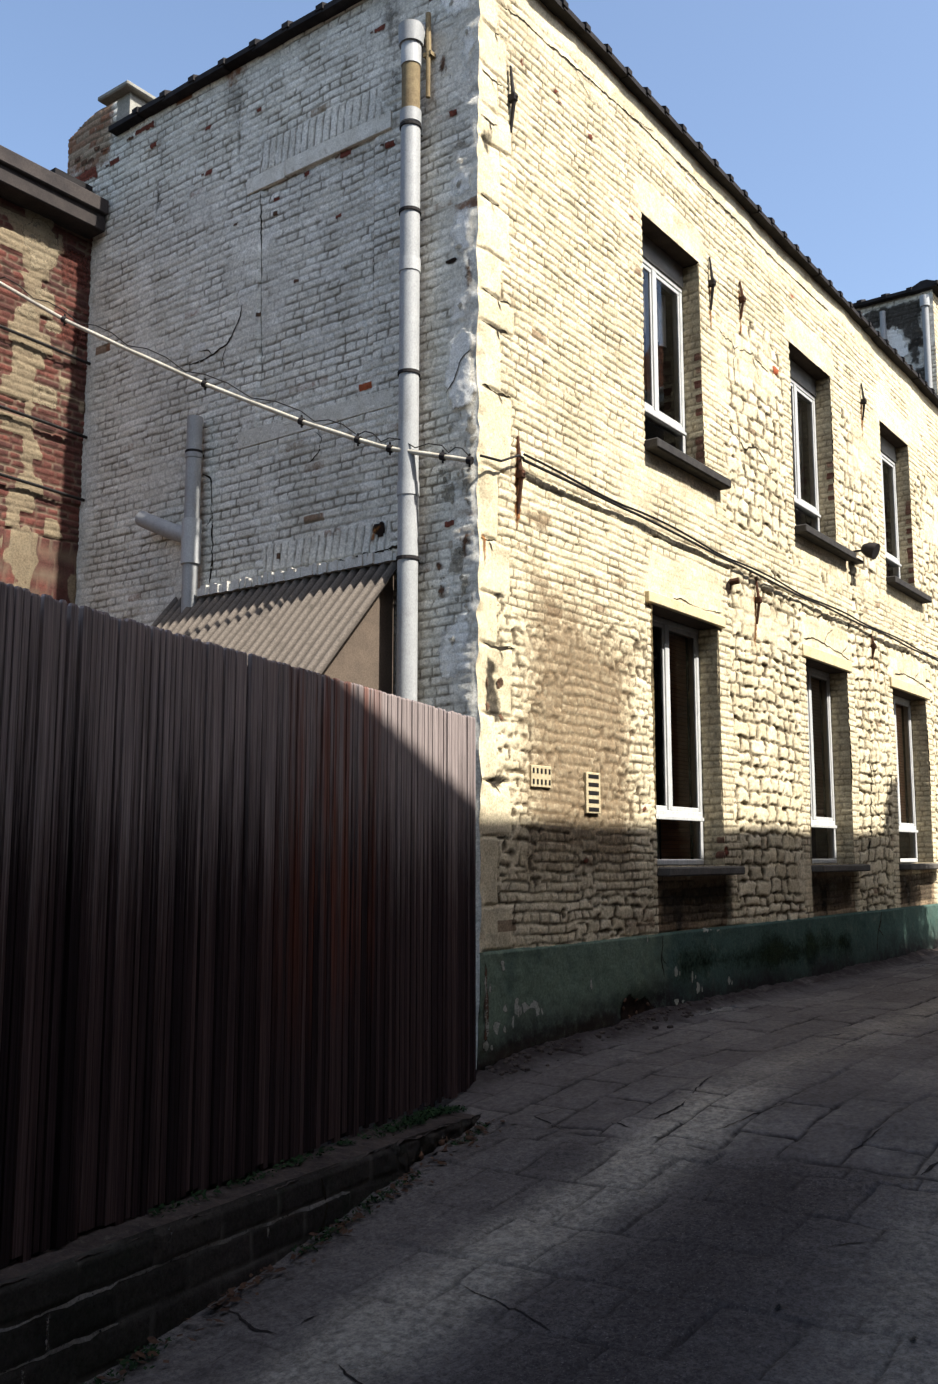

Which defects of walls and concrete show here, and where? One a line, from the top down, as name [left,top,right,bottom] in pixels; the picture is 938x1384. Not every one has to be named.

peeling [23,218,90,289]
peeling [445,244,472,285]
peeling [18,288,88,348]
peeling [32,382,57,409]
damp [677,932,851,979]
spalling [483,960,543,1052]
spalling [621,994,656,1021]
peeling [674,966,703,1005]